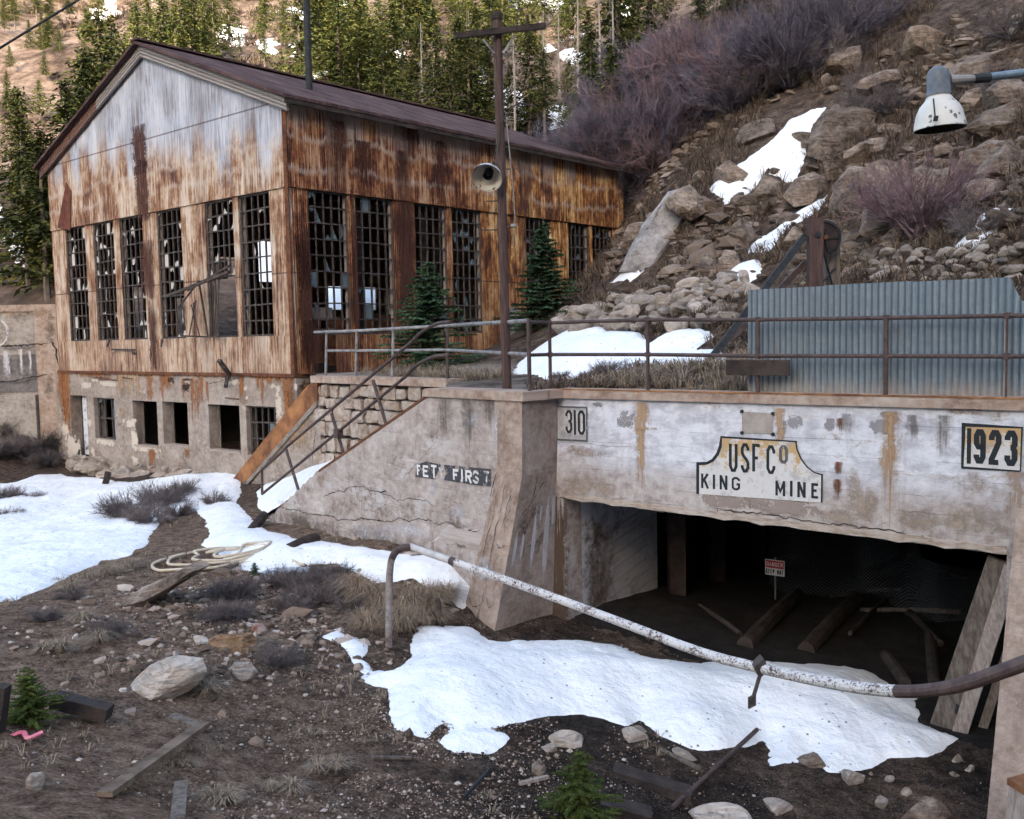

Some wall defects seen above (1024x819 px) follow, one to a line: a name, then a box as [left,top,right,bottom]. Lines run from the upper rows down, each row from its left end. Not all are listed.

corrosion [131,123,150,222]
corrosion [57,240,225,431]
peeling [62,421,115,458]
peeling [80,379,118,389]
peeling [122,418,161,463]
peeling [269,384,283,423]
corrosion [635,403,656,478]
corrosion [833,462,842,494]
peeling [869,411,888,434]
corrosion [880,412,899,505]
crack [281,416,679,618]
crack [697,494,937,536]